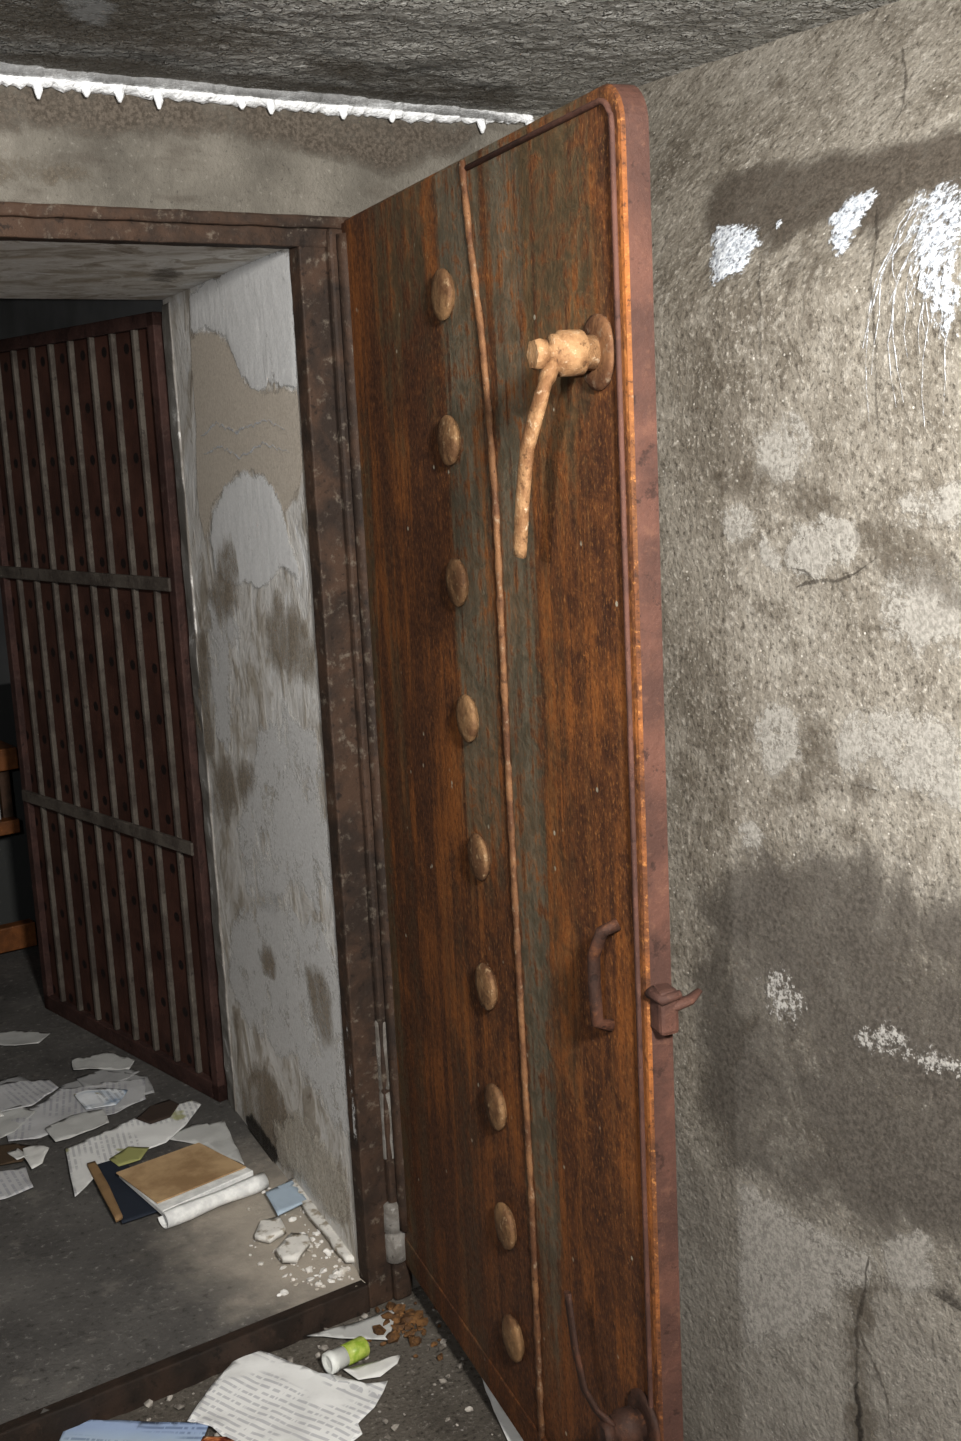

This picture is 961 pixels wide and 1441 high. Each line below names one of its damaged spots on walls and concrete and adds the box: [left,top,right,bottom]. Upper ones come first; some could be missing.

damp [0,0,535,172]
damp [707,126,961,404]
peeling [189,251,303,751]
damp [695,846,961,1242]
crack [854,1256,891,1441]